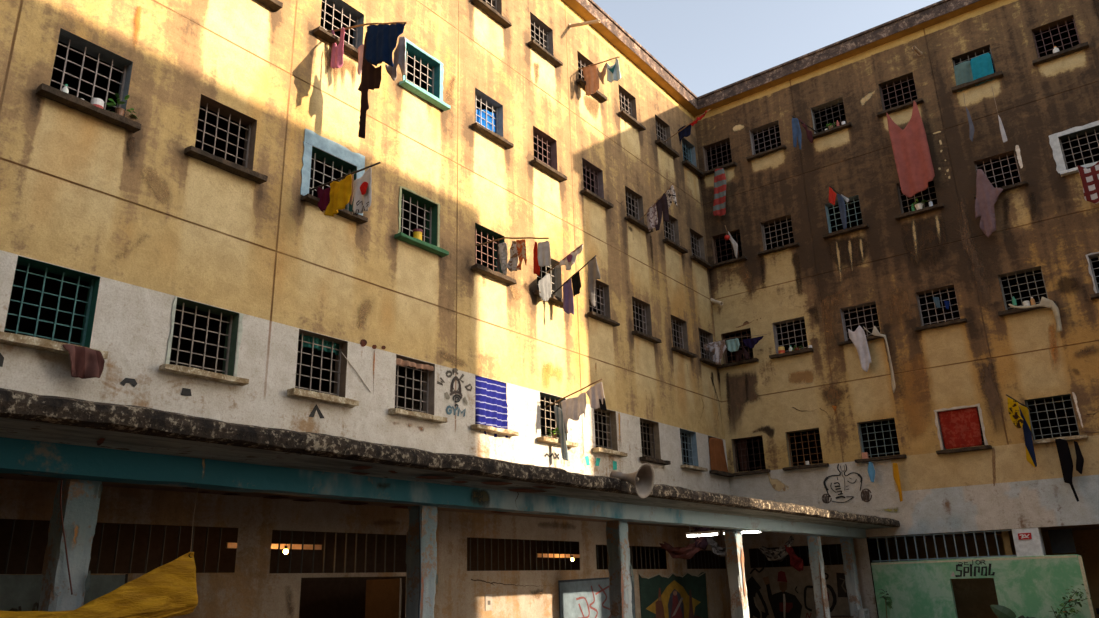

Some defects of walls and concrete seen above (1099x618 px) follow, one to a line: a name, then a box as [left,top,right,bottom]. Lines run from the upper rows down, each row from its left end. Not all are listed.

leakage [792,253,801,289]
leakage [829,236,868,271]
leakage [979,362,1003,429]